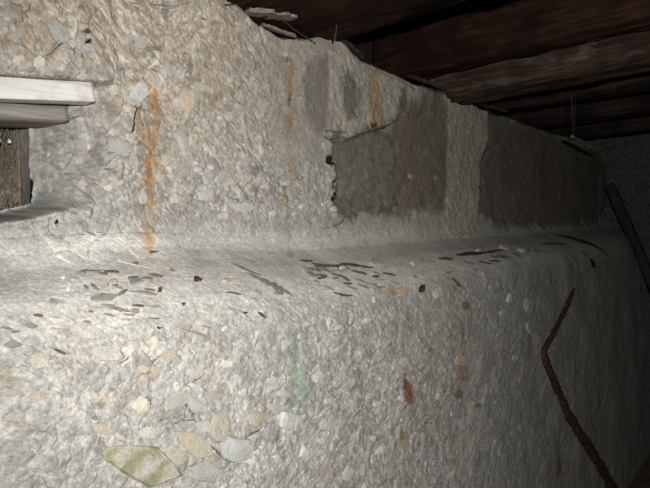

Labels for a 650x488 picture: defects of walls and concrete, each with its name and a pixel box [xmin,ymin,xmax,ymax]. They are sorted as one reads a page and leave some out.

spalling [326,45,489,237]
corrosion [404,373,413,405]
corrosion [541,288,618,488]